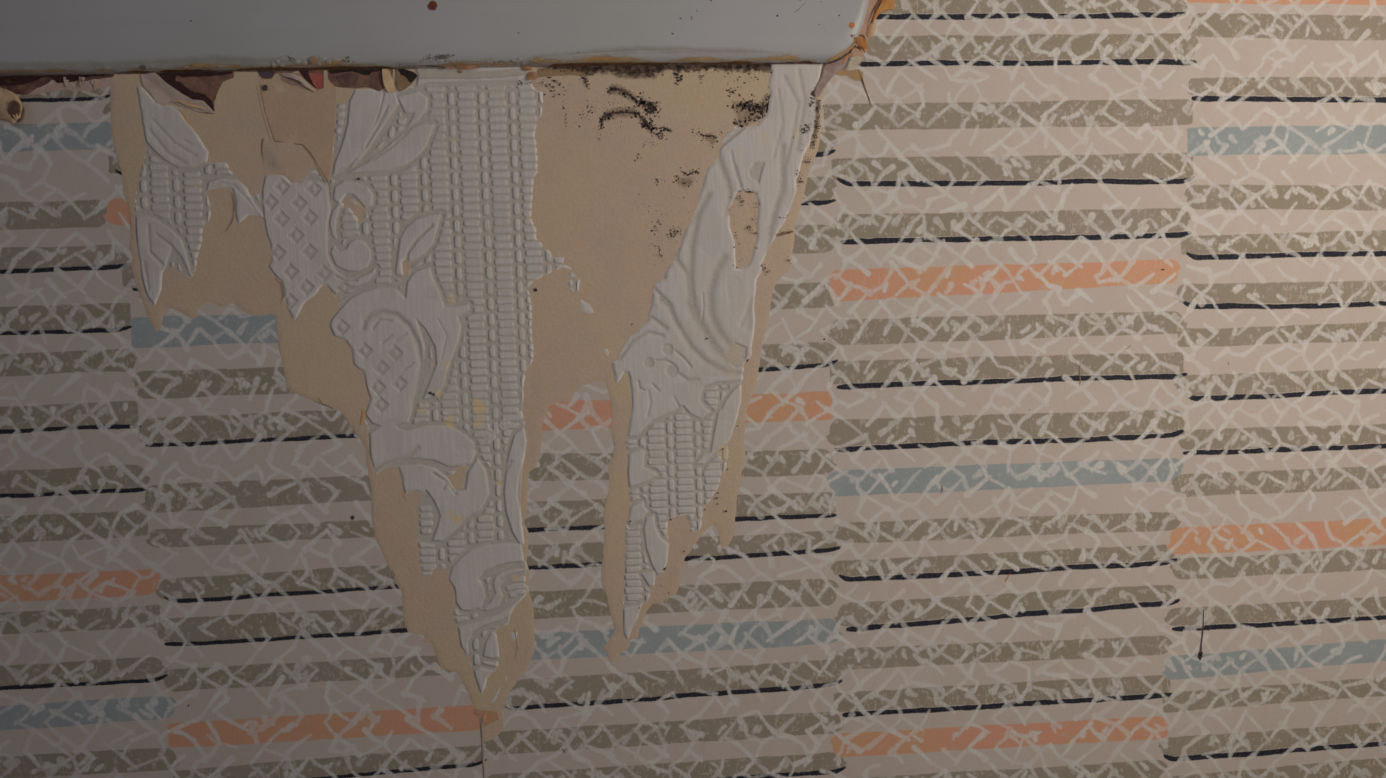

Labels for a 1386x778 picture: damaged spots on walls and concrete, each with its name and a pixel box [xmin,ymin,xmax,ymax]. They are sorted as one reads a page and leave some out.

flaking render [0,66,114,95]
flaking render [175,65,234,108]
damp [101,61,417,111]
peeling [266,50,687,91]
damp [828,40,863,81]
damp [518,56,811,162]
damp [630,167,700,274]